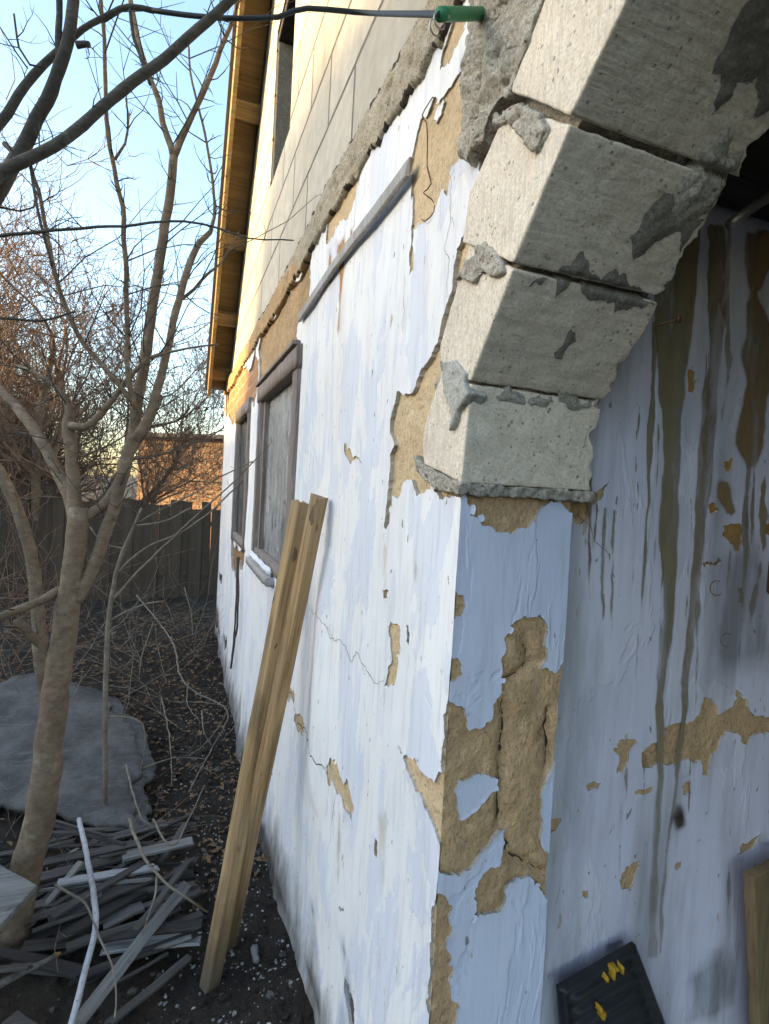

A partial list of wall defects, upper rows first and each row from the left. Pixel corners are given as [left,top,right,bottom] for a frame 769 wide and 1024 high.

peeling [440,22,466,69]
peeling [409,71,463,275]
spalling [383,235,609,534]
damp [587,478,615,615]
damp [636,224,769,832]
crack [307,603,385,702]
peeling [384,621,409,687]
peeling [326,757,354,830]
spalling [398,615,561,923]
peeling [614,690,769,777]
spalling [425,893,461,1024]